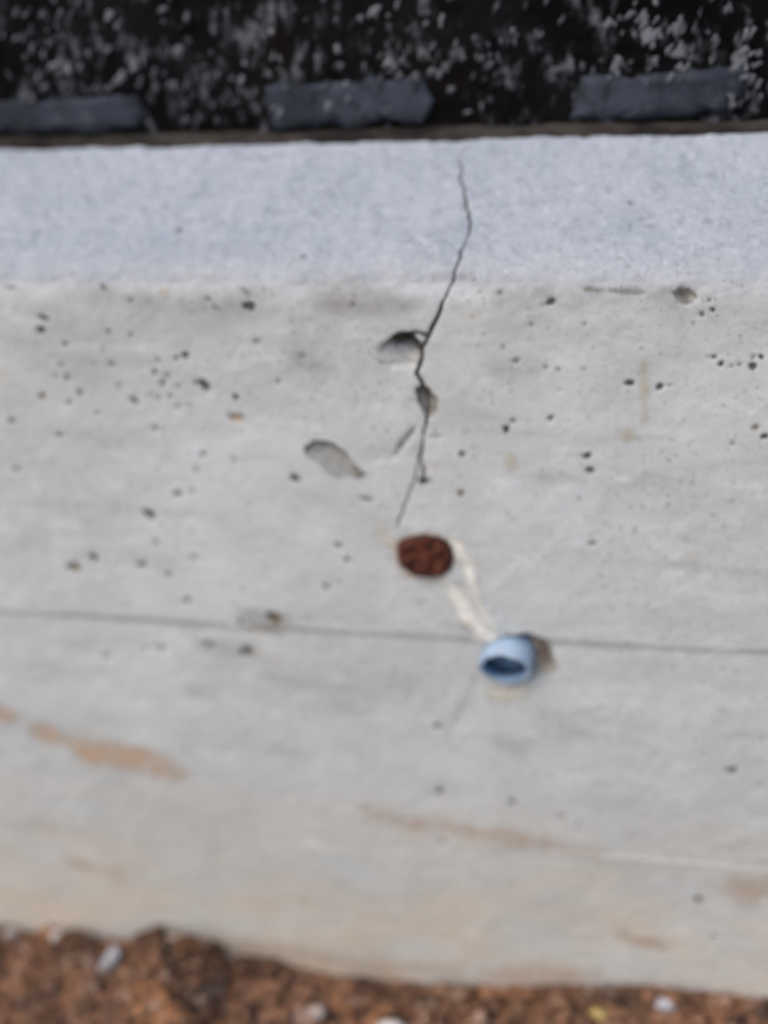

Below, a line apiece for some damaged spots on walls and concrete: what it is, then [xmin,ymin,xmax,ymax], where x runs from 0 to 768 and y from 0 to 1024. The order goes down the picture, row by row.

crack [414,156,472,386]
spalling [369,331,423,363]
spalling [304,440,365,478]
crack [397,414,429,529]
corrosion [398,535,498,644]